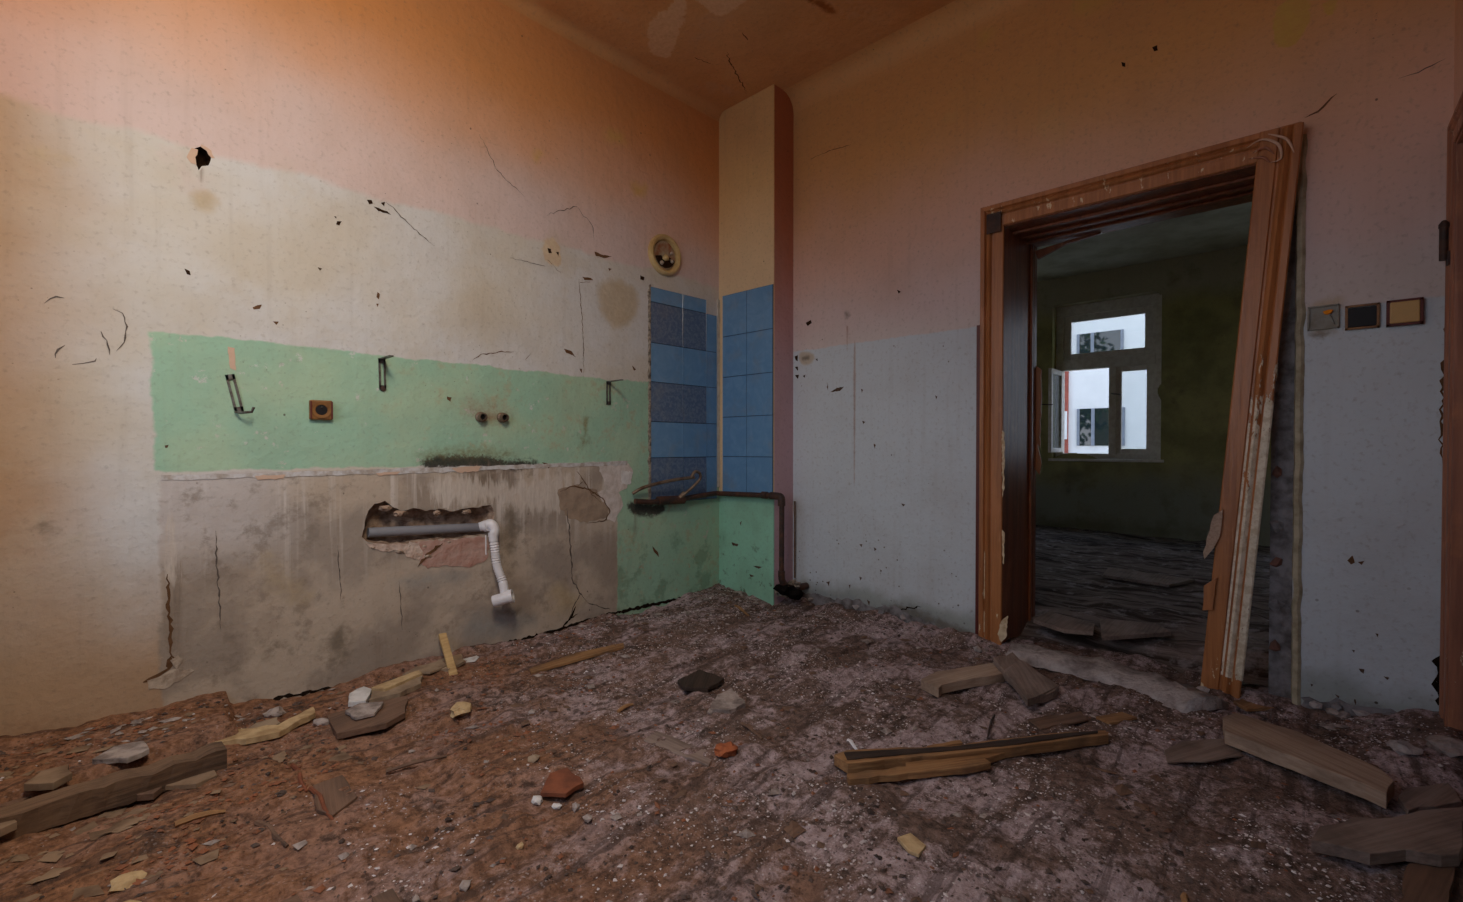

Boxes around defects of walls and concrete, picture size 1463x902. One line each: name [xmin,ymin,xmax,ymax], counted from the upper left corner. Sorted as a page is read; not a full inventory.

crack [143,574,174,683]
crack [214,537,222,629]
flaking render [161,461,633,523]
spalling [362,501,494,569]
crack [504,473,681,642]